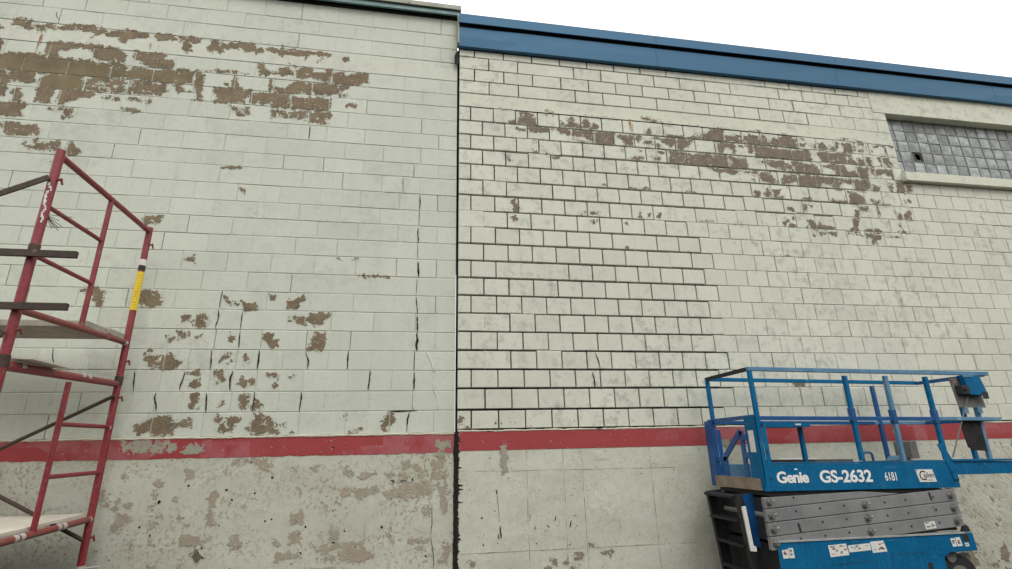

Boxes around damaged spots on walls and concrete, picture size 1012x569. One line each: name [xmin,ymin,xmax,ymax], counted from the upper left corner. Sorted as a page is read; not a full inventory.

peeling [0,16,370,165]
peeling [506,108,916,245]
peeling [139,289,164,308]
crack [133,371,185,410]
peeling [121,313,209,456]
crack [205,290,260,412]
peeling [223,295,258,312]
peeling [213,331,297,436]
peeling [268,294,331,352]
peeling [380,412,397,432]
crack [388,174,439,432]
peeling [98,478,233,569]